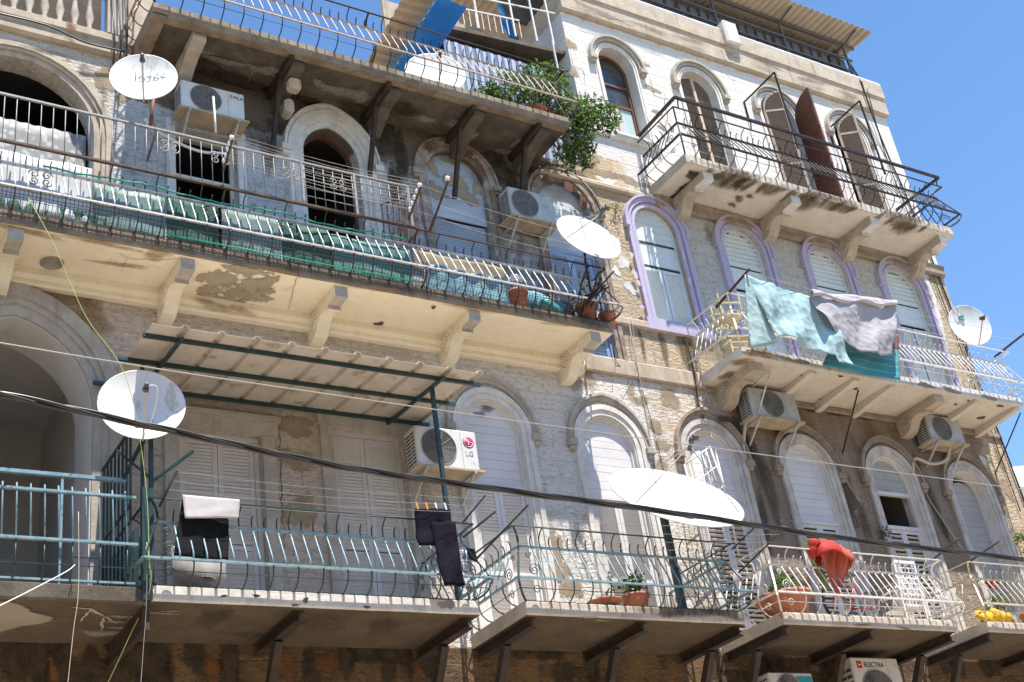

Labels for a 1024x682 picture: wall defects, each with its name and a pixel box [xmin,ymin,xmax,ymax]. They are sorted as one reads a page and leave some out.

peeling [424,137,486,207]
damp [622,164,856,260]
damp [876,211,928,234]
peeling [192,265,280,303]
spalling [276,416,317,473]
spalling [280,492,318,529]
crack [74,607,116,630]